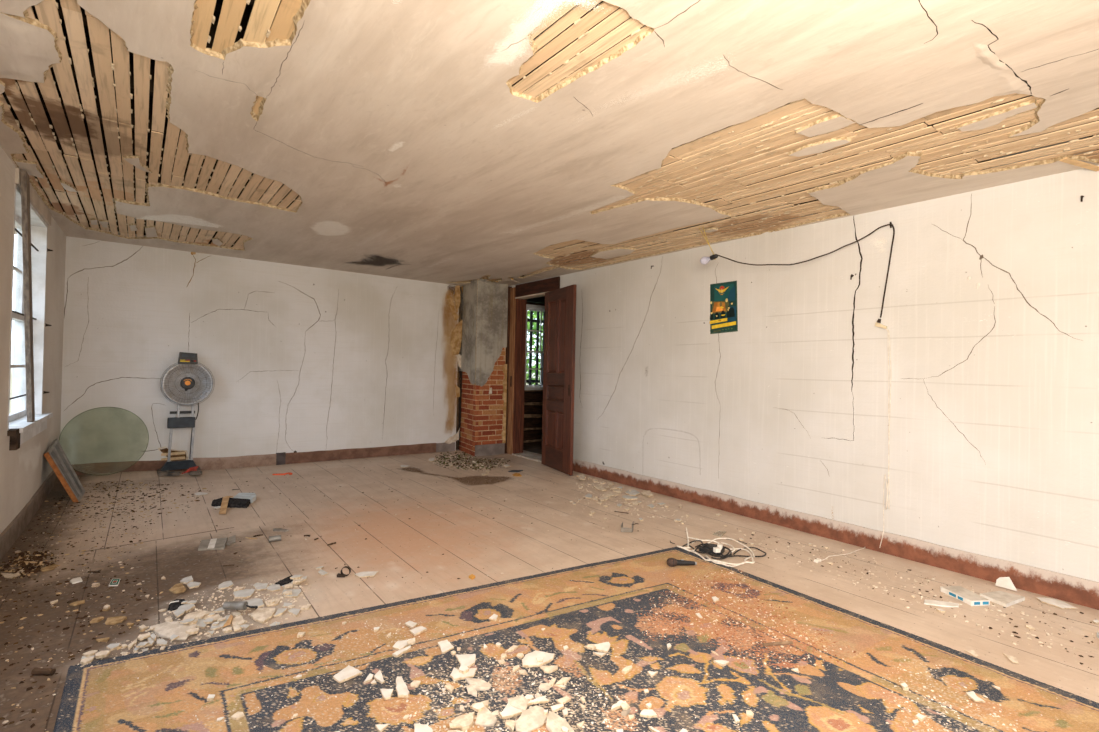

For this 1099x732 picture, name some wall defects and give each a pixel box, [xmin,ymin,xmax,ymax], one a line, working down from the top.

spalling [0,0,311,255]
spalling [506,0,655,103]
crack [654,0,700,47]
spalling [517,93,1099,279]
crack [918,0,938,43]
crack [972,20,1098,96]
crack [64,377,164,452]
crack [188,281,339,452]
crack [433,293,463,449]
flaking render [446,275,502,369]
crack [779,217,863,474]
crack [901,194,1083,462]